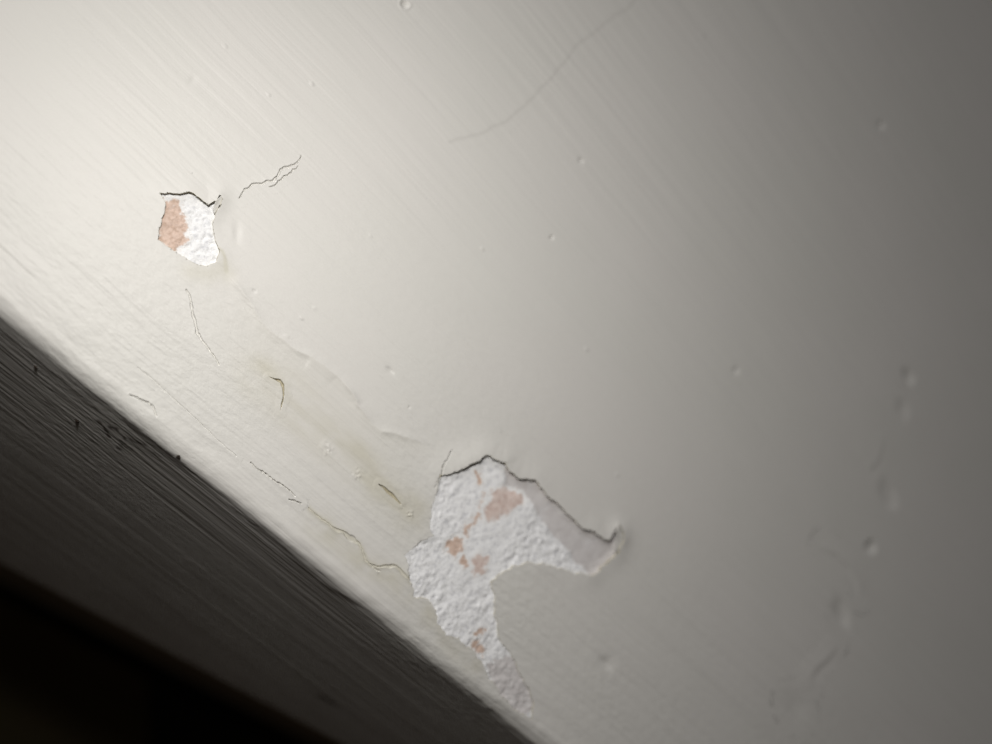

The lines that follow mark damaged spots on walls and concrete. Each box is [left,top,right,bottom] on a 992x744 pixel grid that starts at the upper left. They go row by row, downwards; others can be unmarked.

peeling [141,169,236,278]
crack [231,146,311,208]
crack [121,385,165,426]
crack [241,453,413,589]
peeling [393,420,637,729]